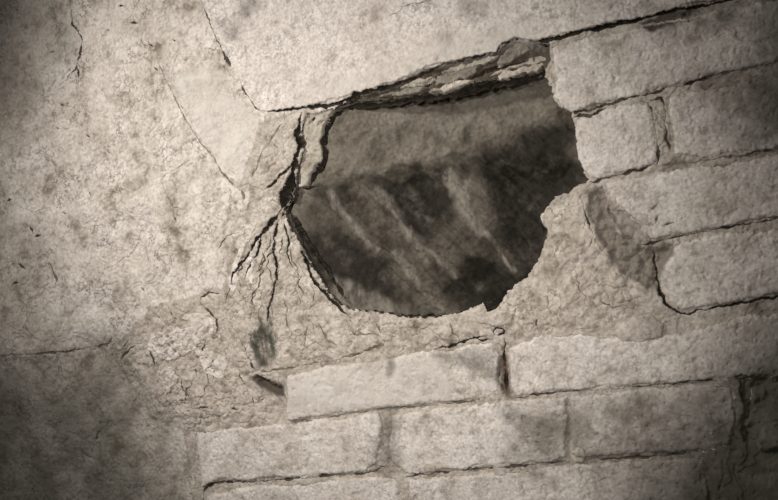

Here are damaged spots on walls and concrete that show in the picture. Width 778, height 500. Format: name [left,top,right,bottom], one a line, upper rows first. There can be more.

peeling [217,184,251,215]
peeling [212,222,260,293]
crack [3,0,730,410]
spalling [284,39,552,319]
spalling [588,187,673,288]
crack [642,218,778,315]
leakage [250,319,276,366]
spalling [252,375,285,396]
spalling [497,355,509,394]